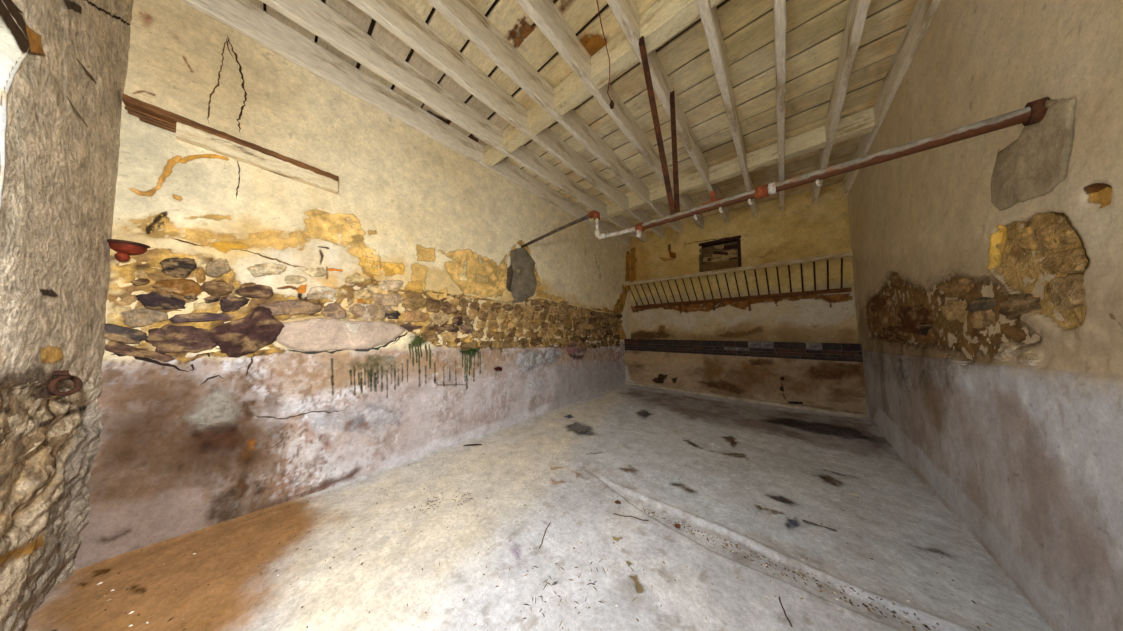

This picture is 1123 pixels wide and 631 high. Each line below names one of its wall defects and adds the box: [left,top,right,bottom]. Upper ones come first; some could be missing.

crack [84,0,130,26]
rust [508,17,534,48]
crack [207,36,247,132]
peeling [130,154,229,196]
crack [234,161,242,199]
spalling [1084,183,1112,208]
spalling [104,209,1090,366]
peeling [40,346,63,363]
crack [286,328,438,354]
damp [190,390,238,452]
spalling [0,386,86,538]
spalling [0,535,43,565]